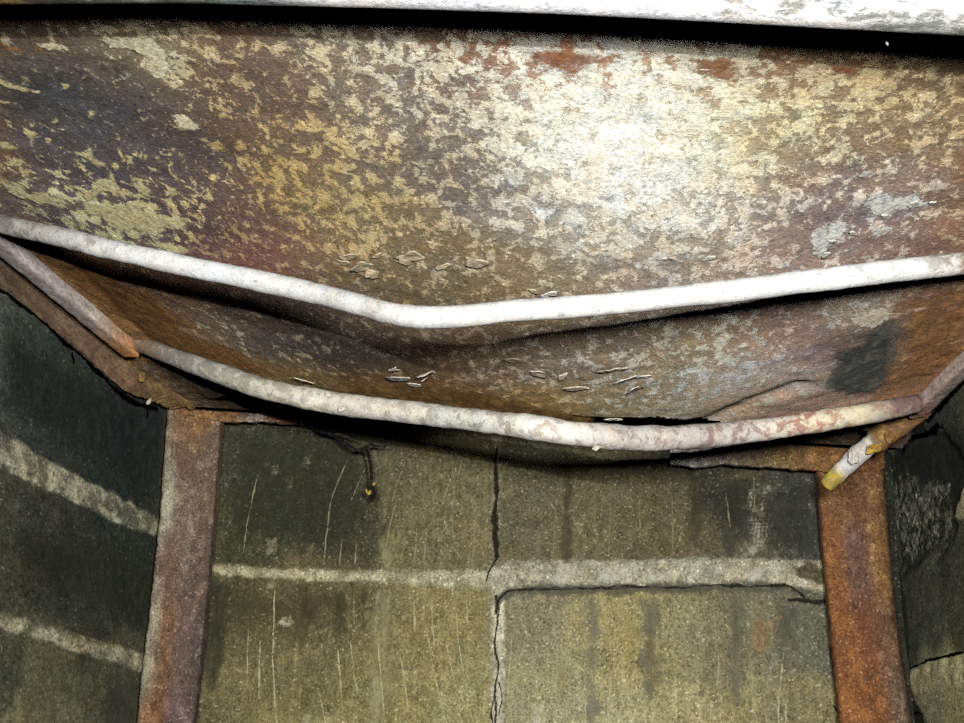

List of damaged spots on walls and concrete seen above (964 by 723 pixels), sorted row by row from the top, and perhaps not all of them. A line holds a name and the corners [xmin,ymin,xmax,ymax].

rust [532,49,601,72]
rust [689,58,736,79]
crack [0,288,158,418]
rust [43,255,273,375]
rust [897,289,964,376]
rust [341,382,594,423]
crack [485,446,826,723]